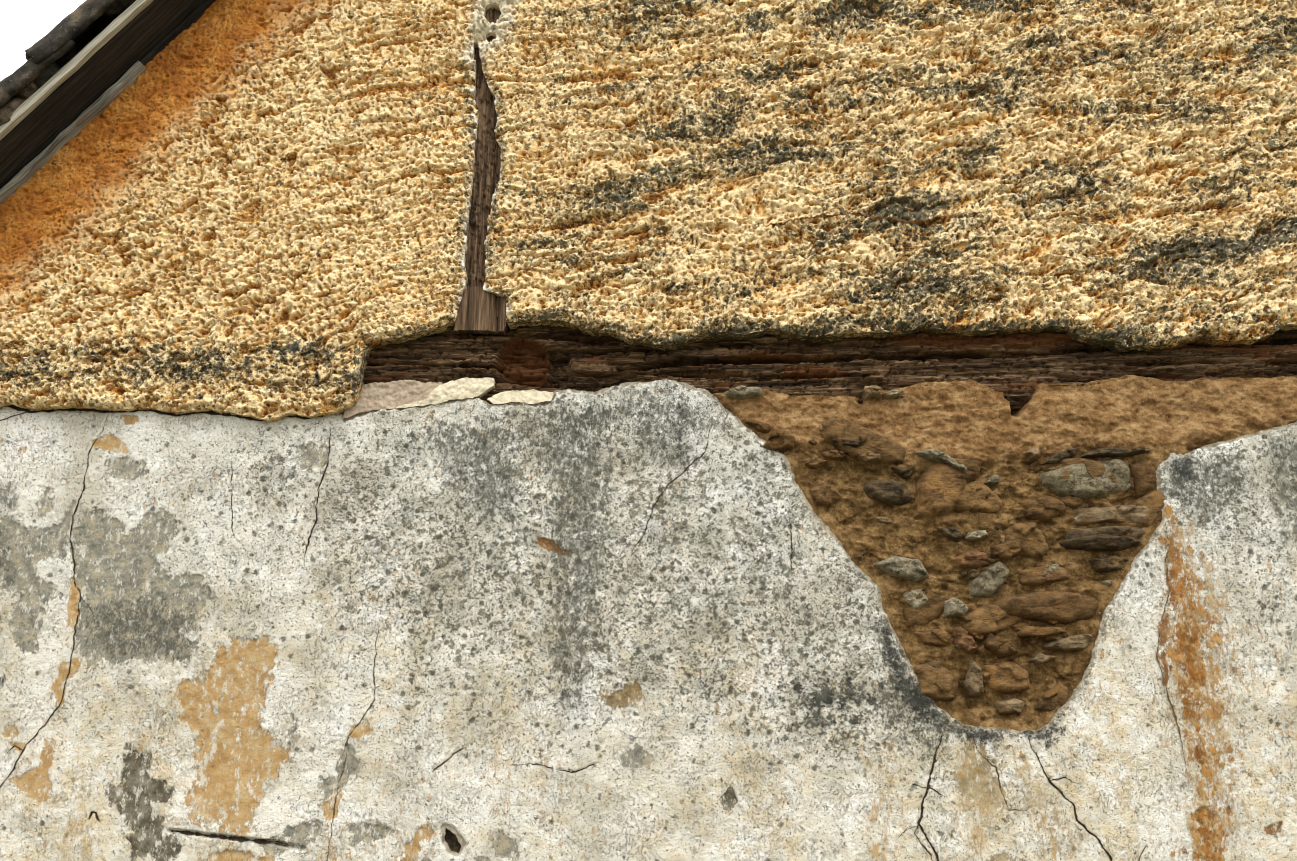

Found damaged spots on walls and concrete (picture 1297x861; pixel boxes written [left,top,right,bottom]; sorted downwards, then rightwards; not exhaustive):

damp [0,481,19,509]
peeling [92,415,149,483]
peeling [297,442,329,473]
damp [85,585,199,662]
crack [0,405,331,787]
spalling [713,375,1297,813]
peeling [0,486,522,861]
peeling [621,743,654,768]
crack [898,733,1147,861]
peeling [985,852,1022,861]